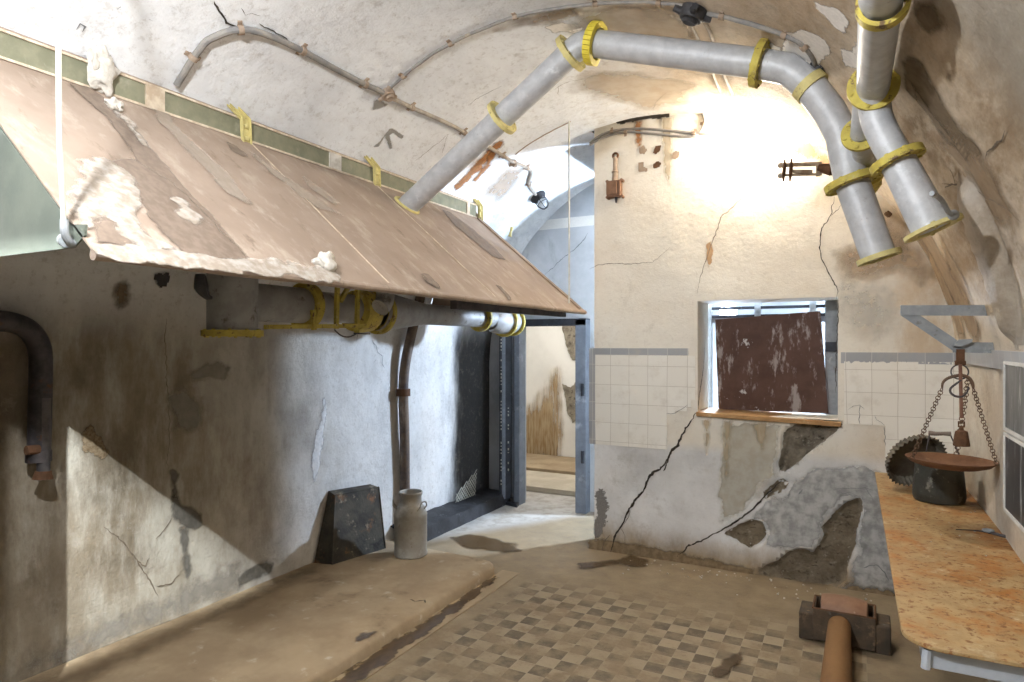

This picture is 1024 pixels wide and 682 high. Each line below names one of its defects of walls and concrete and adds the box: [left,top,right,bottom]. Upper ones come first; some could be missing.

crack [214,2,288,40]
rust [454,141,504,190]
crack [819,203,886,446]
crack [602,348,705,550]
spalling [763,420,842,498]
damp [451,534,520,552]
peeling [593,489,610,538]
damp [578,539,754,574]
crack [677,481,803,557]
spalling [725,519,766,548]
spalling [759,498,863,587]
damp [846,585,894,596]